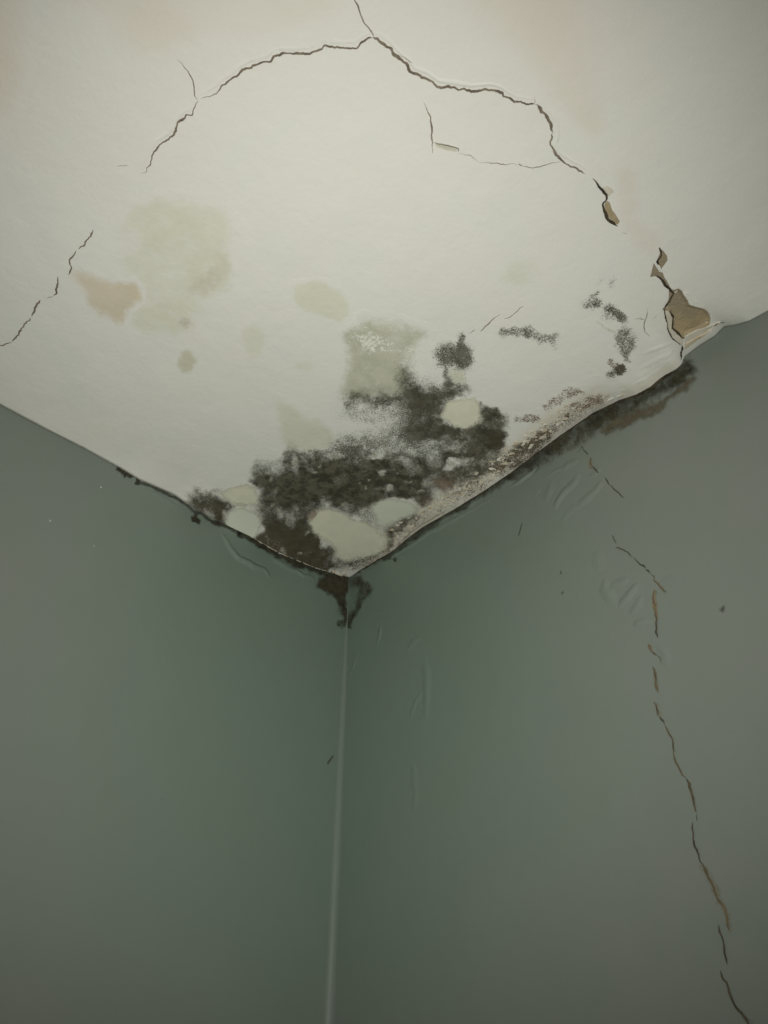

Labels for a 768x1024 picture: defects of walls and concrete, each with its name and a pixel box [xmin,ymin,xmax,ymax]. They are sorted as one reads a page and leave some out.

crack [125,0,620,226]
crack [0,231,93,346]
water stain [61,187,250,379]
spalling [606,248,724,402]
water stain [116,276,694,628]
crack [612,535,749,1024]